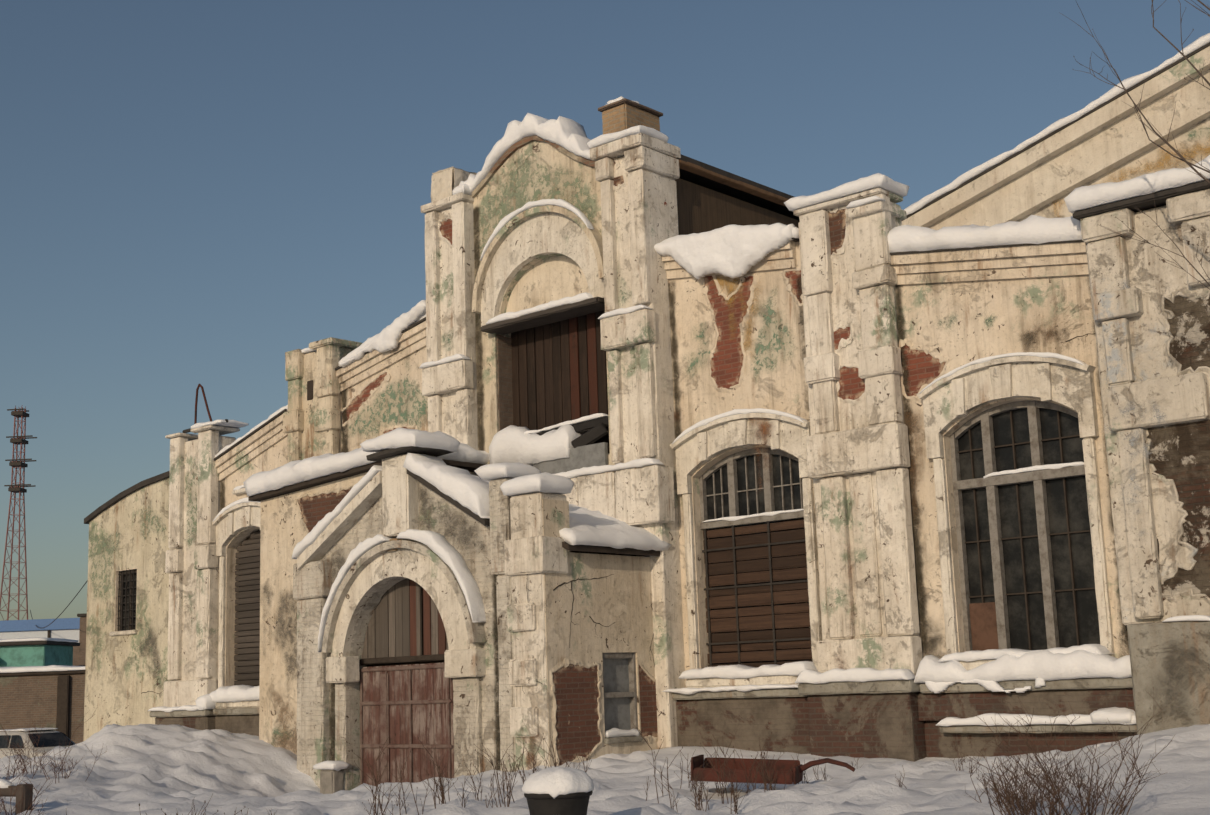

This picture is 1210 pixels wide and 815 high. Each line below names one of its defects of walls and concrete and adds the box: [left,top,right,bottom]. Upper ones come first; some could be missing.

spalling [827,205,850,260]
spalling [341,368,428,435]
spalling [688,272,792,394]
spalling [834,323,866,405]
spalling [899,338,953,401]
spalling [1158,290,1210,376]
spalling [294,484,355,534]
spalling [1130,420,1210,605]
damp [143,631,158,669]
crack [526,574,615,648]
spalling [549,658,604,766]
spalling [639,663,658,743]